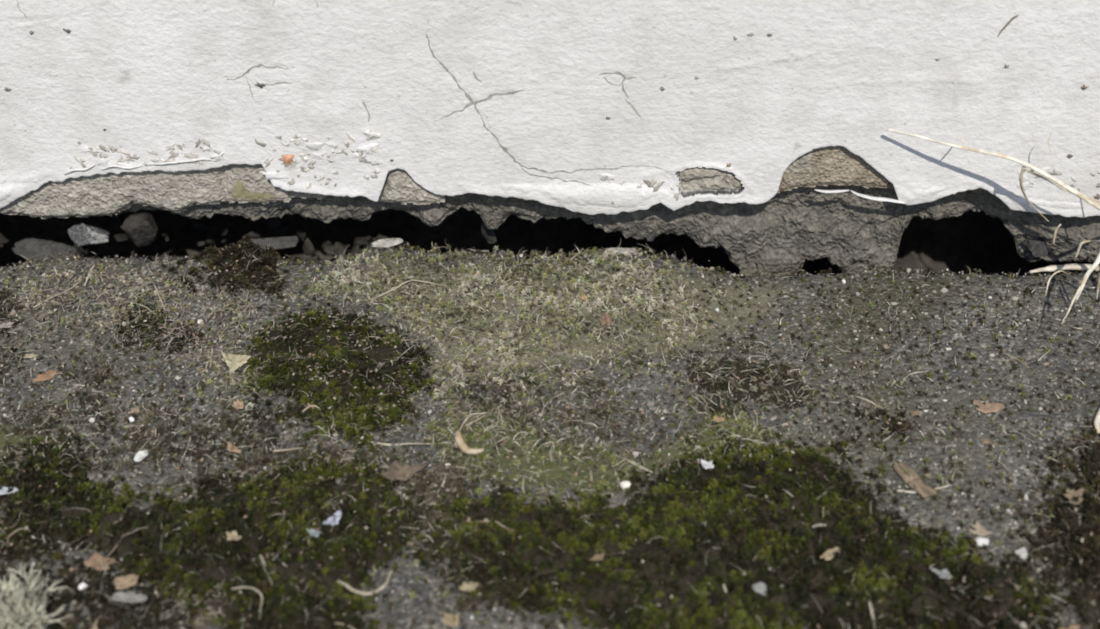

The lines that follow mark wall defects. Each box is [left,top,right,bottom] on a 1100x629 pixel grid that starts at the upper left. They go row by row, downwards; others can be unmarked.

crack [426,34,669,186]
spalling [0,130,445,219]
peeling [599,173,682,201]
spalling [777,146,905,204]
peeling [1016,165,1077,190]